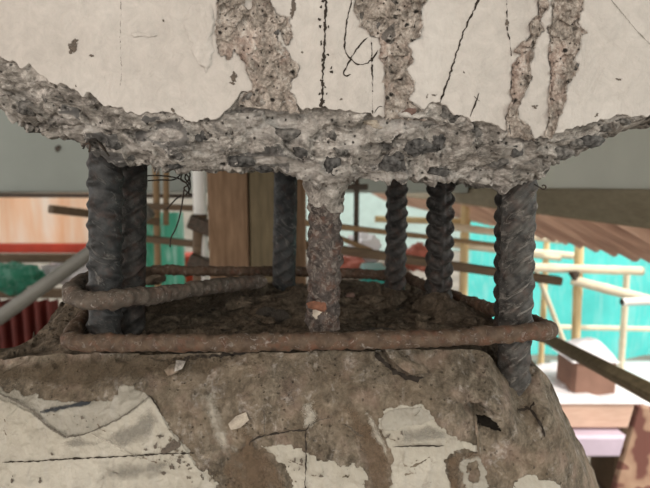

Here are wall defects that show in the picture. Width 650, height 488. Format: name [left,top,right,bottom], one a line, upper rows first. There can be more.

crack [318,0,382,114]
crack [440,0,480,102]
spalling [0,0,650,335]
spalling [497,340,532,396]
crack [4,452,193,463]
peeling [0,384,219,488]
peeling [261,444,368,488]
peeling [378,400,501,488]
peeling [513,475,560,488]